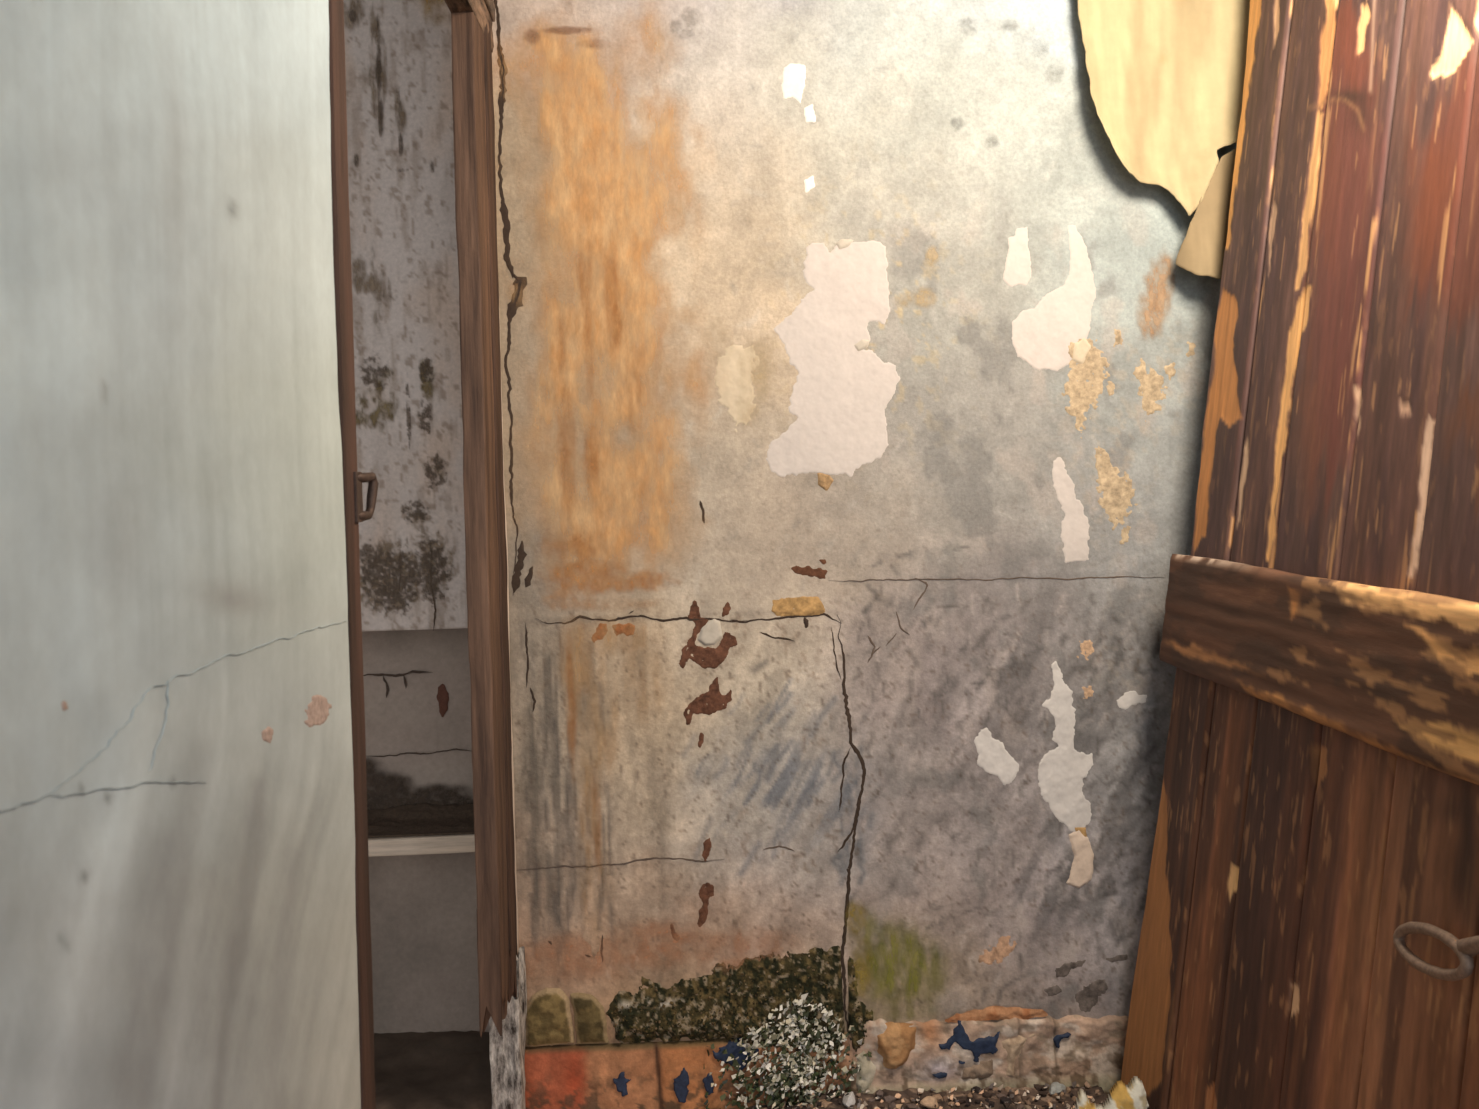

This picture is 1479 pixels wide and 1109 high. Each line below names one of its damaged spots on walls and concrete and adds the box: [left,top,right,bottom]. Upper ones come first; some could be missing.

leakage [345,0,405,172]
peeling [781,63,816,122]
leakage [353,260,384,300]
leakage [356,357,432,446]
peeling [766,239,900,491]
peeling [1003,227,1031,287]
peeling [1012,225,1138,563]
leakage [359,456,453,616]
crack [494,0,1164,1031]
crack [0,621,344,812]
peeling [974,728,1019,785]
peeling [1038,661,1094,888]